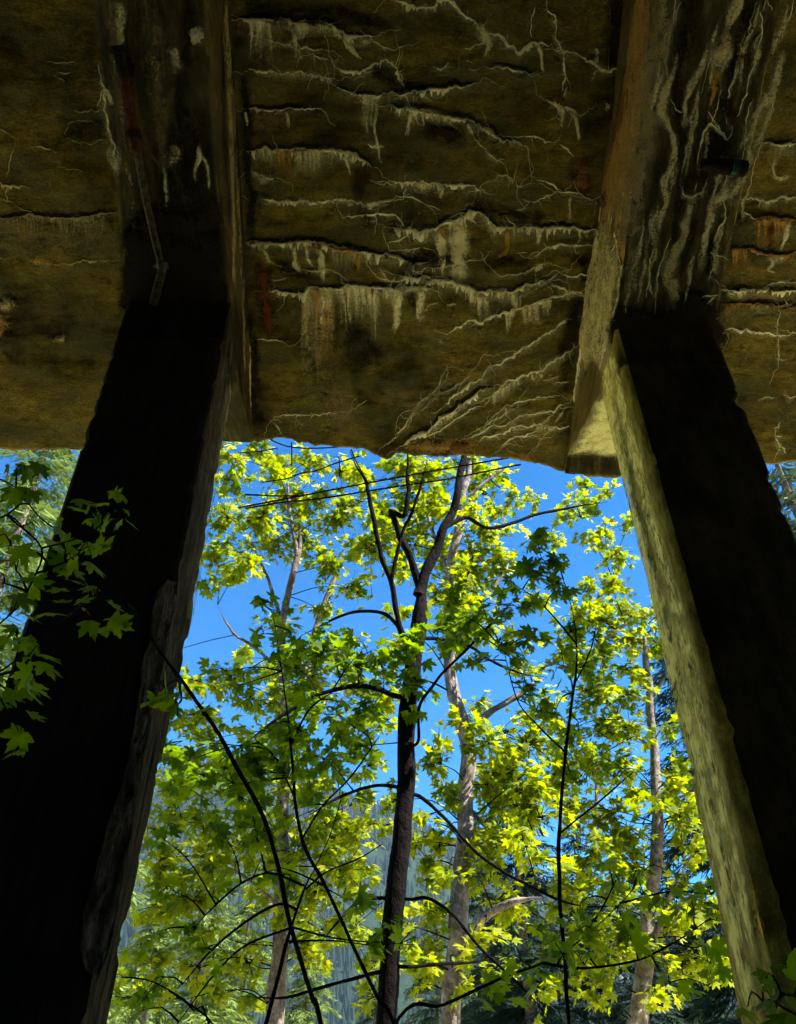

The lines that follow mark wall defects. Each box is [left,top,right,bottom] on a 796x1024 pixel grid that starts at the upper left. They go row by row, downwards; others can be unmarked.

leakage [247,4,388,29]
crack [231,0,617,467]
leakage [408,252,454,269]
leakage [558,0,794,1008]